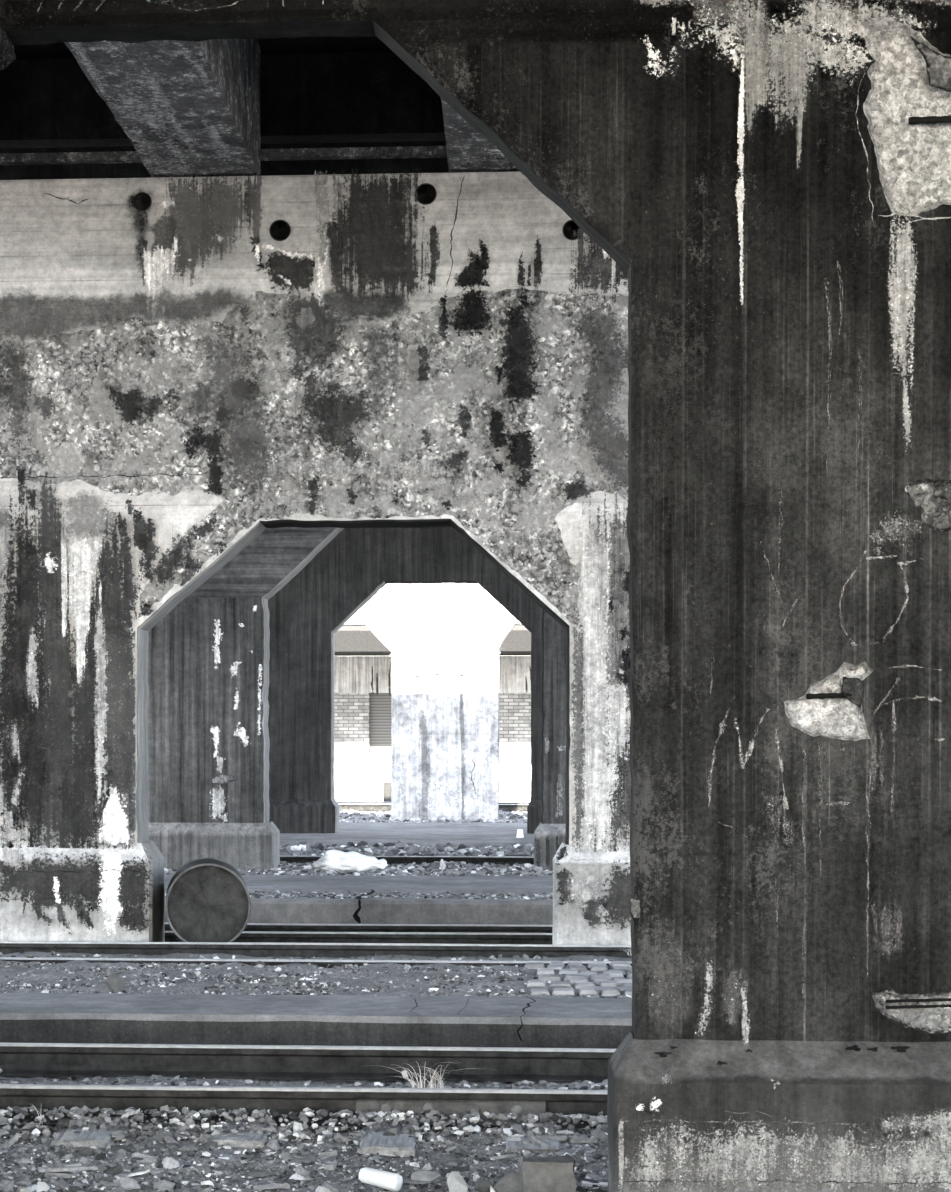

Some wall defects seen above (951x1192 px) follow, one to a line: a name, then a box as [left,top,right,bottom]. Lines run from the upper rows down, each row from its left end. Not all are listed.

spalling [0,27,16,70]
peeling [69,40,234,174]
leakage [138,166,346,317]
leakage [638,0,951,305]
spalling [860,17,951,217]
spalling [0,288,629,625]
leakage [0,462,38,698]
leakage [0,719,26,868]
leakage [23,493,156,937]
leakage [209,619,263,824]
spalling [784,662,873,741]
crack [517,996,536,1041]